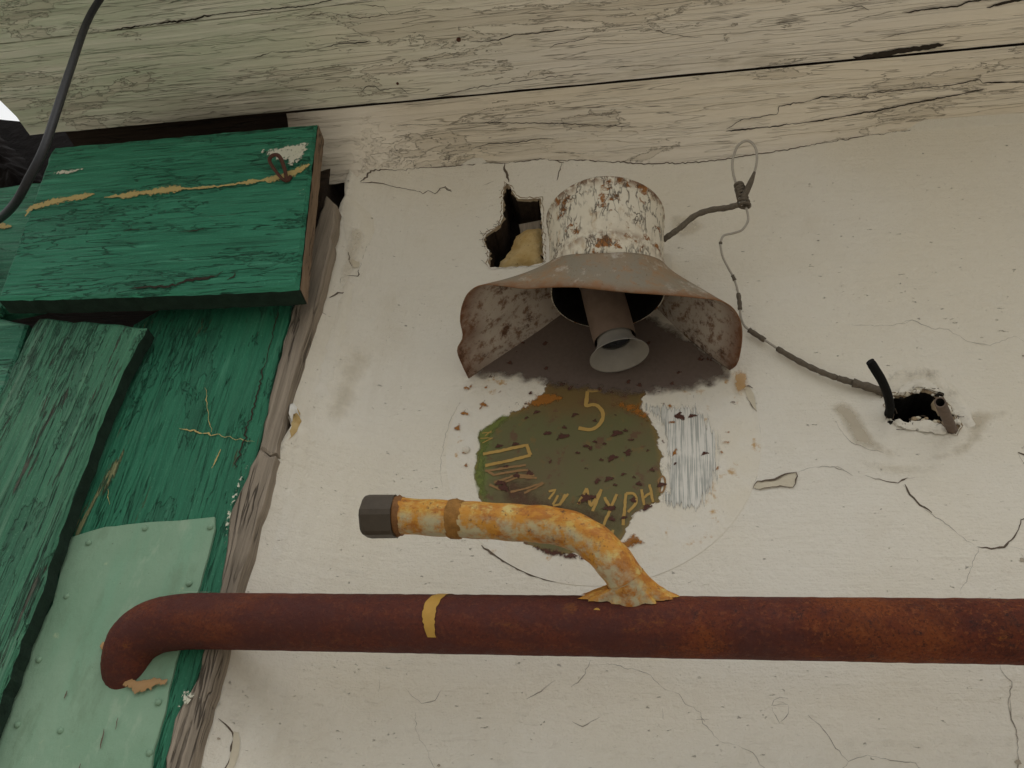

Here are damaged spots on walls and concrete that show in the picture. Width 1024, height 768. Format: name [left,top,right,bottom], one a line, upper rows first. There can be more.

crack [413,30,587,96]
crack [853,0,1023,60]
crack [360,79,1024,194]
flaking render [480,182,546,269]
spalling [892,378,947,435]
flaking render [753,472,798,490]
crack [826,466,1024,587]